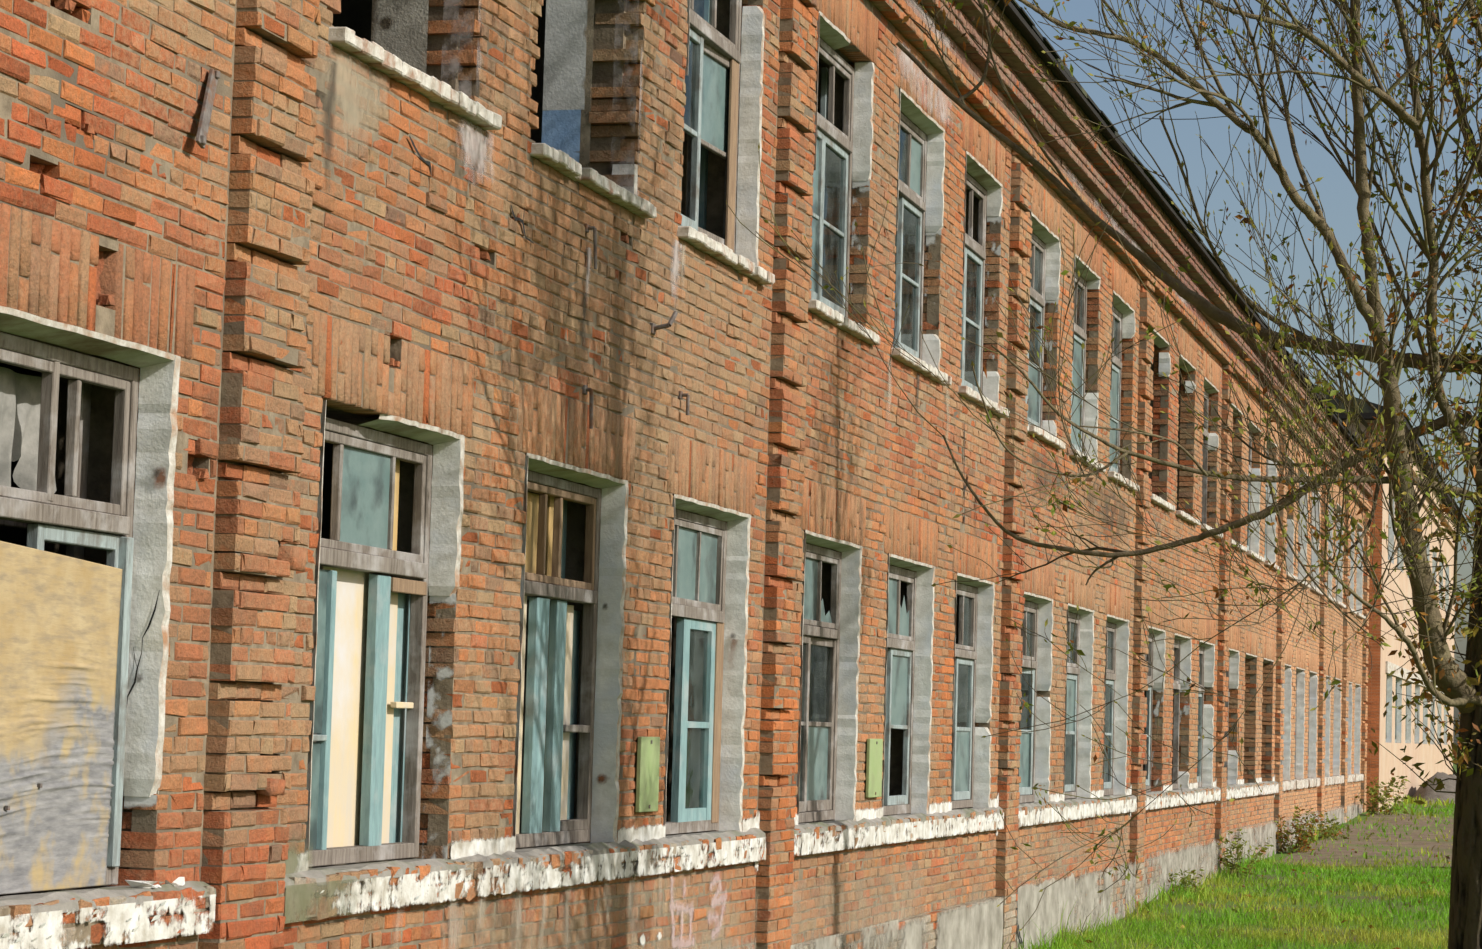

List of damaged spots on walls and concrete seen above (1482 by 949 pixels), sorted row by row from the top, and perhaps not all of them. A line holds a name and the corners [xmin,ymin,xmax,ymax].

crack [127,592,159,702]
peeling [794,776,1279,855]
peeling [297,852,308,872]
peeling [321,812,766,915]
peeling [0,894,216,949]